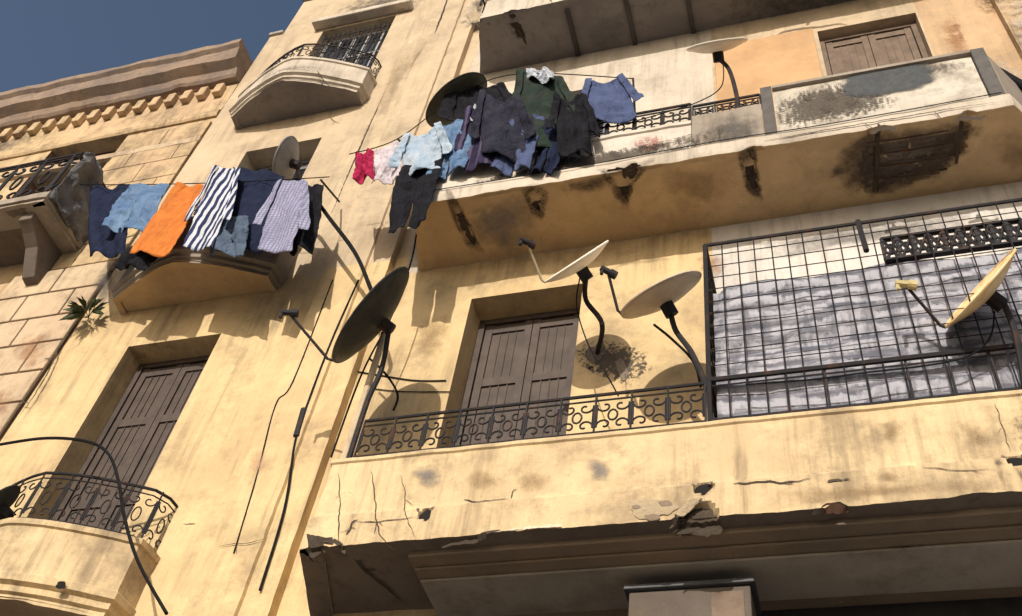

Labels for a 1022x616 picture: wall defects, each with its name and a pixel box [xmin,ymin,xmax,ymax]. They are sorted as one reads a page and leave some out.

water stain [842,63,952,96]
crack [335,472,418,547]
spalling [630,497,723,537]
crack [354,559,401,601]